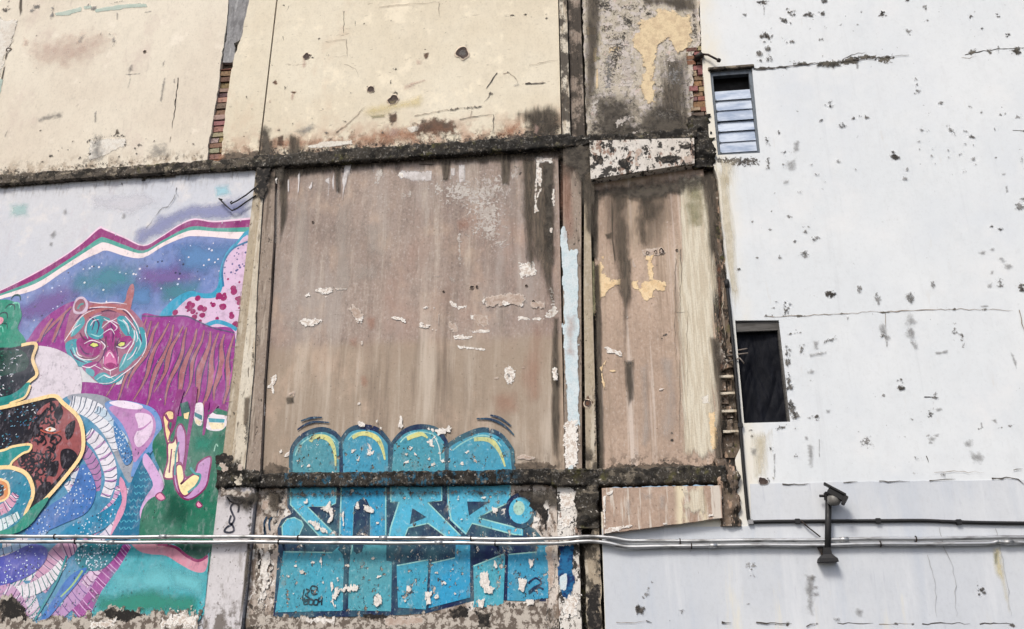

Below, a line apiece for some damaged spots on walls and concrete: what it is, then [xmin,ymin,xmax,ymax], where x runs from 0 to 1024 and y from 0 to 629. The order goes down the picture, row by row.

water stain [586,0,698,135]
peeling [595,8,706,116]
crack [753,52,899,70]
crack [963,46,1021,58]
rust [278,117,456,148]
rust [505,108,555,134]
water stain [254,114,792,474]
peeling [594,176,748,458]
crack [768,308,1024,329]
peeling [514,488,582,535]
peeling [0,593,204,629]
peeling [249,546,582,629]